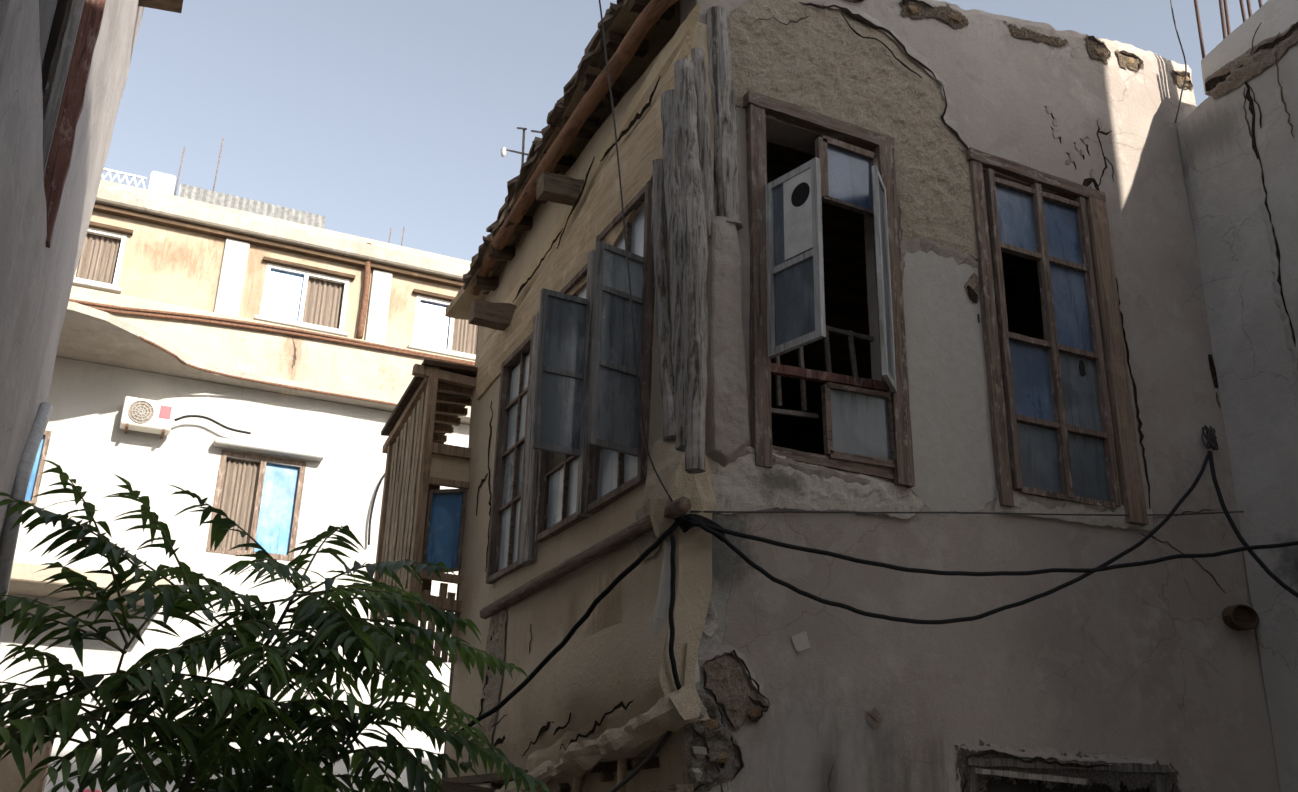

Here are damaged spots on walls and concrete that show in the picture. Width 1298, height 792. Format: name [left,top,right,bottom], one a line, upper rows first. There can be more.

spalling [1004,21,1068,47]
spalling [1085,35,1144,72]
crack [513,75,661,302]
peeling [728,0,978,268]
crack [1082,126,1114,191]
crack [1243,22,1298,394]
crack [1115,276,1226,593]
peeling [772,454,870,485]
spalling [683,597,773,792]
crack [492,700,633,756]
spalling [952,740,1182,792]